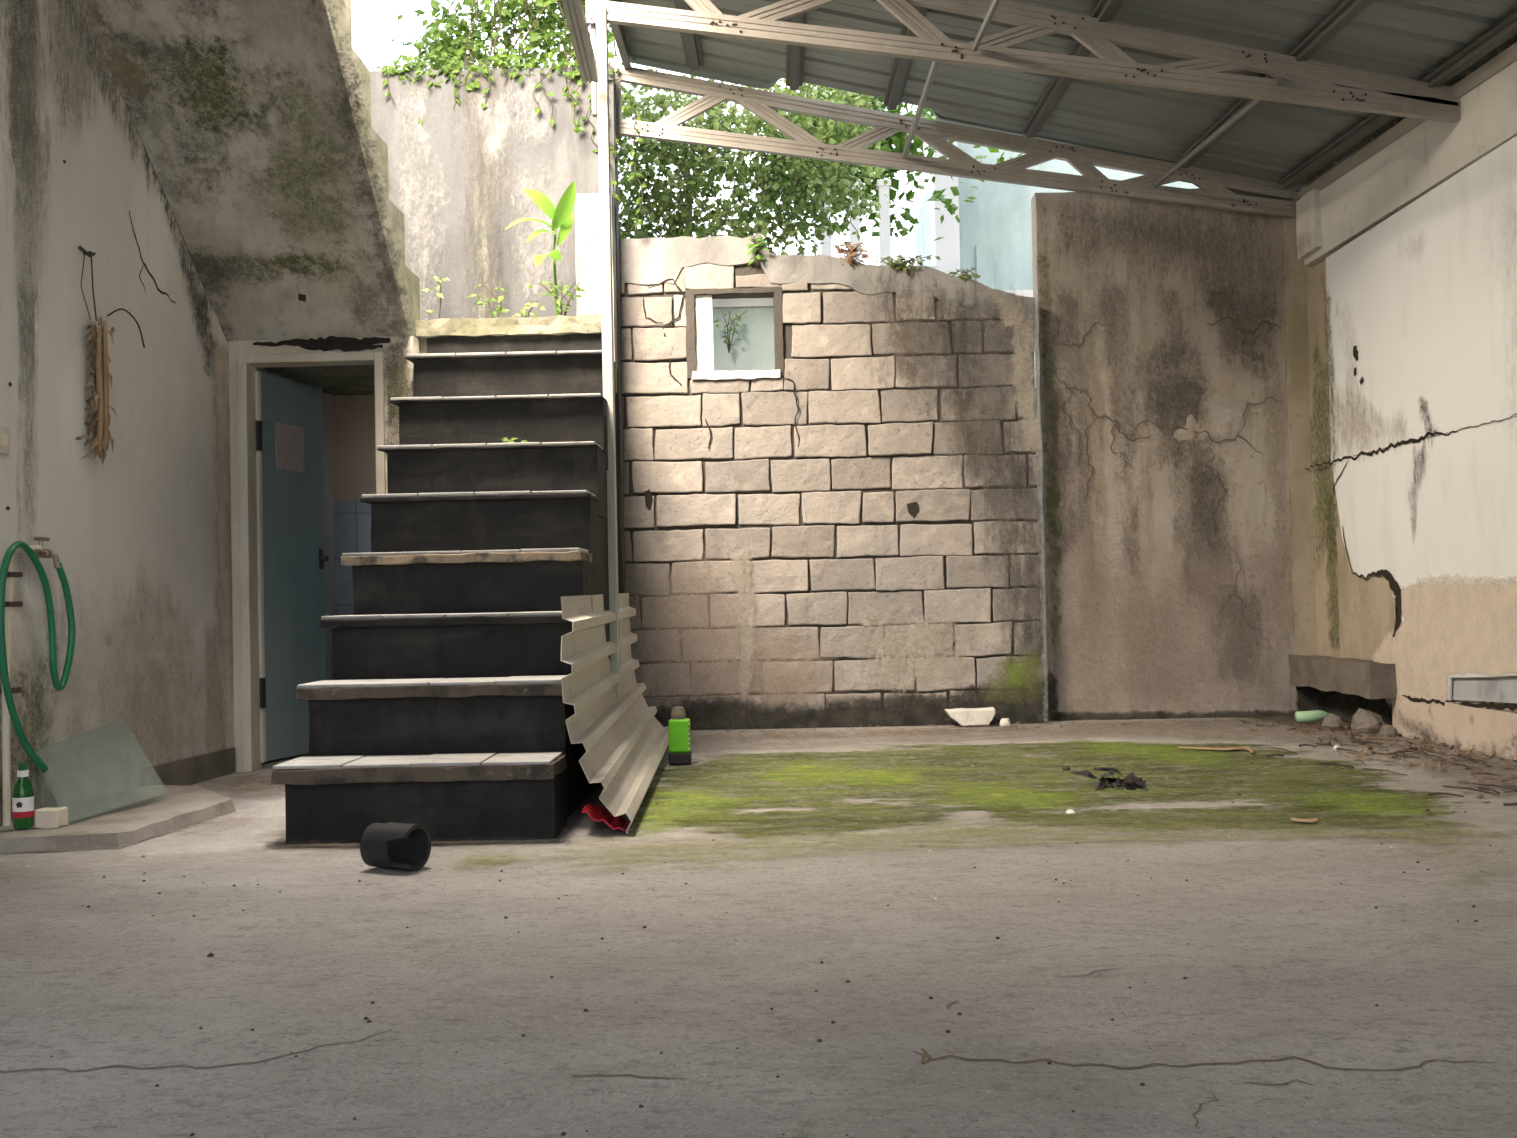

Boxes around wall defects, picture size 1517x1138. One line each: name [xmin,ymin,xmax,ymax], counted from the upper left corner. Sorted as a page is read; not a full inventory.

damp [462,63,560,318]
damp [5,0,443,497]
damp [639,200,1436,742]
crack [1305,413,1517,490]
peeling [1373,574,1517,704]
crack [1402,695,1517,711]
crack [0,1029,392,1072]
crack [570,1072,687,1080]
crack [913,1048,1495,1127]